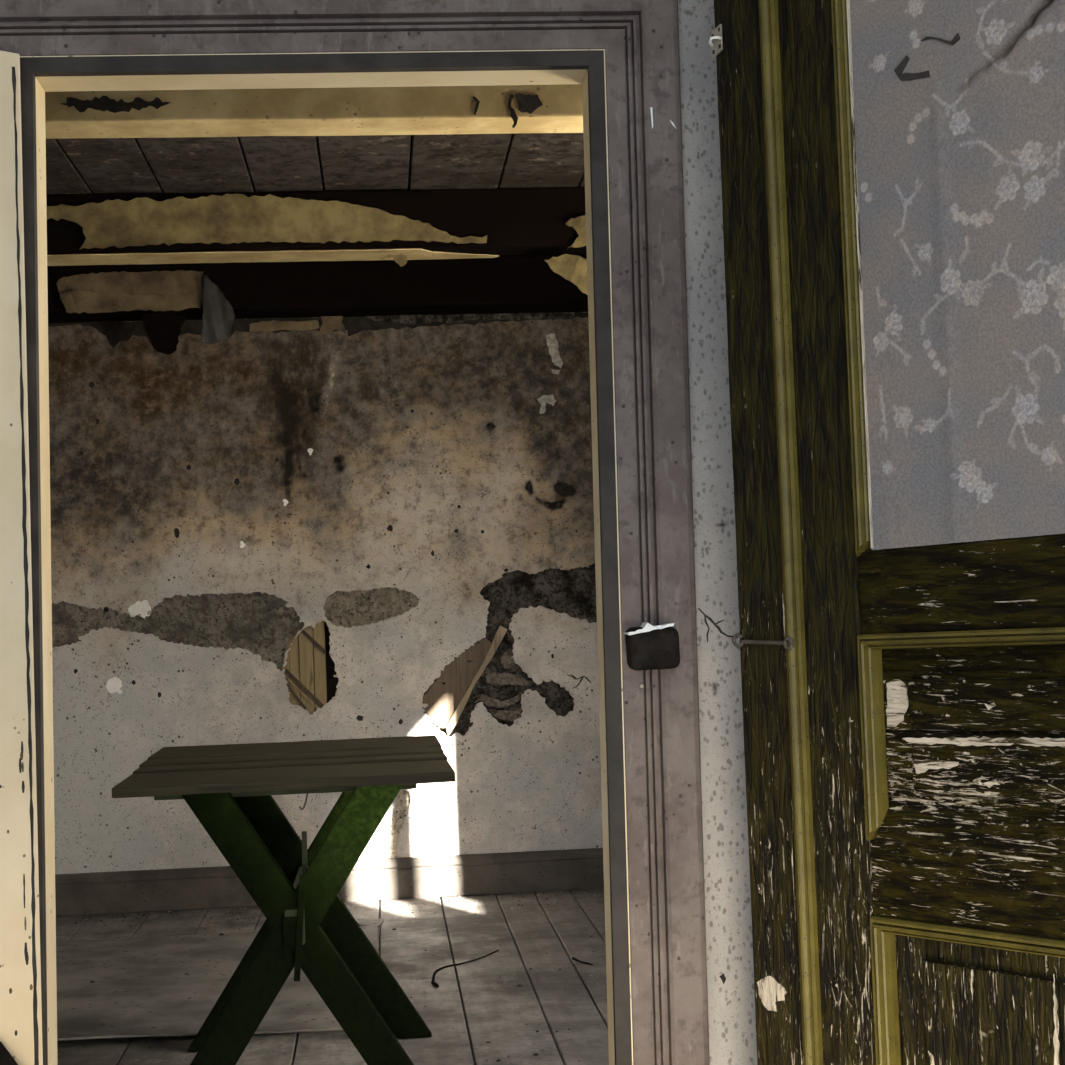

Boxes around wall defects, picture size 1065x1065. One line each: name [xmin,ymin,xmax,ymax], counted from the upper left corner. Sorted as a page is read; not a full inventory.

peeling [60,96,172,113]
water stain [262,337,416,499]
water stain [464,336,592,511]
water stain [50,443,158,526]
spalling [52,587,419,714]
spalling [421,563,597,737]
peeling [886,679,1065,748]
peeling [913,759,959,775]
peeling [757,976,787,1012]